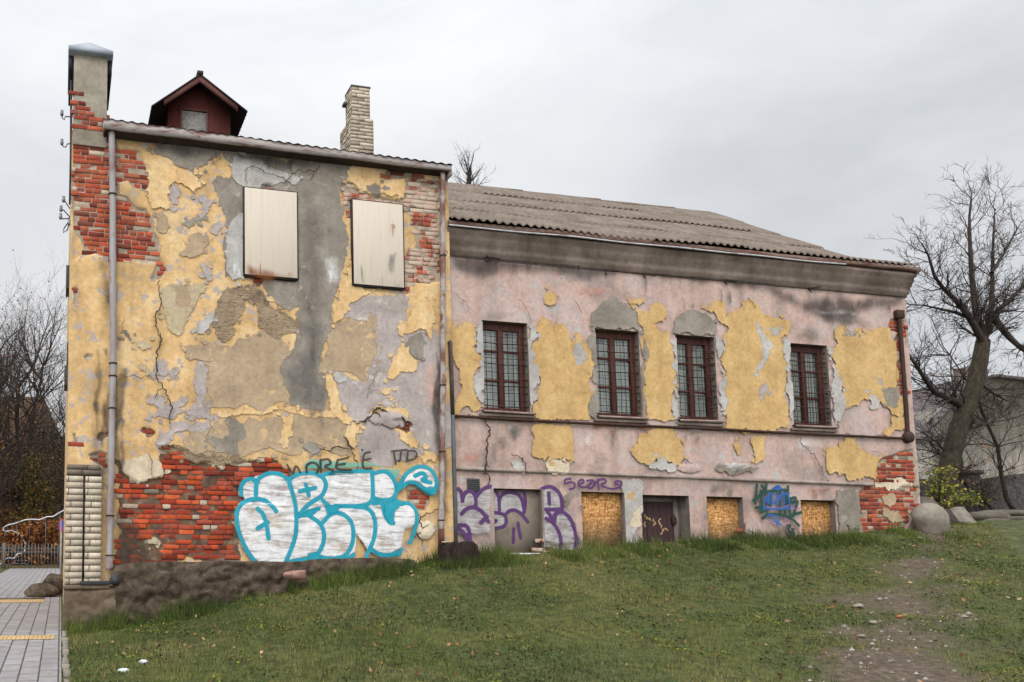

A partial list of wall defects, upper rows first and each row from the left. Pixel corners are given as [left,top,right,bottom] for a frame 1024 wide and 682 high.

crack [120,280,228,477]
peeling [68,139,483,567]
crack [483,419,527,485]
peeling [511,285,596,475]
peeling [627,297,688,475]
peeling [692,299,791,476]
peeling [831,319,911,436]
flaking render [823,437,920,532]